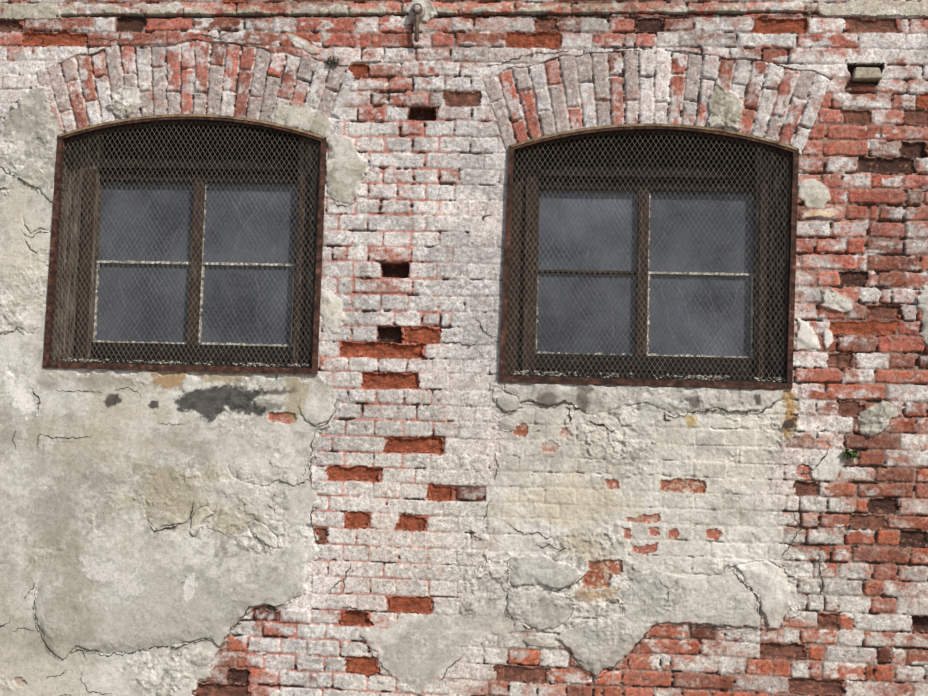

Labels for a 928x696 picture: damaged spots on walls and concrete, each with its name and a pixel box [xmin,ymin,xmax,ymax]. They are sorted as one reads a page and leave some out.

spalling [0,18,89,47]
crack [0,166,38,193]
flaking render [0,134,57,234]
crack [12,387,140,447]
spalling [383,435,445,455]
spalling [325,464,384,483]
spalling [395,513,427,531]
spalling [386,595,433,614]
crack [506,563,539,630]
crack [565,565,768,679]
crack [0,583,290,696]
spalling [345,656,381,676]